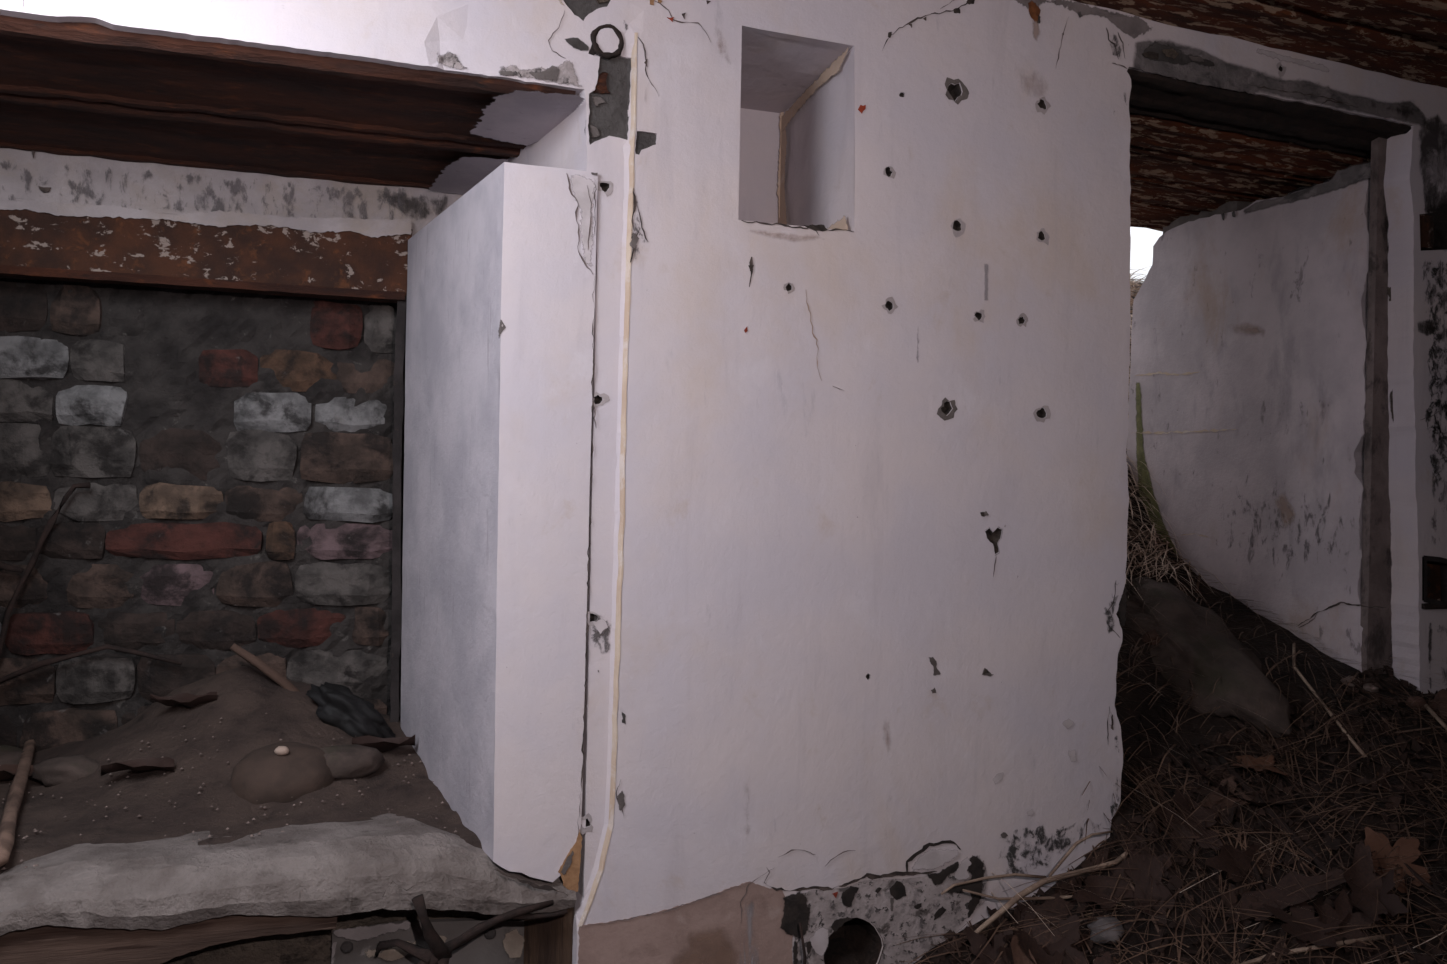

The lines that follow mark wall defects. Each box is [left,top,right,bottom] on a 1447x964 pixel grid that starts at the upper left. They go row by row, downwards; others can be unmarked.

spalling [437,52,467,69]
crack [883,0,975,48]
water stain [1397,108,1447,484]
peeling [499,0,656,927]
water stain [578,869,793,964]
peeling [780,849,987,964]